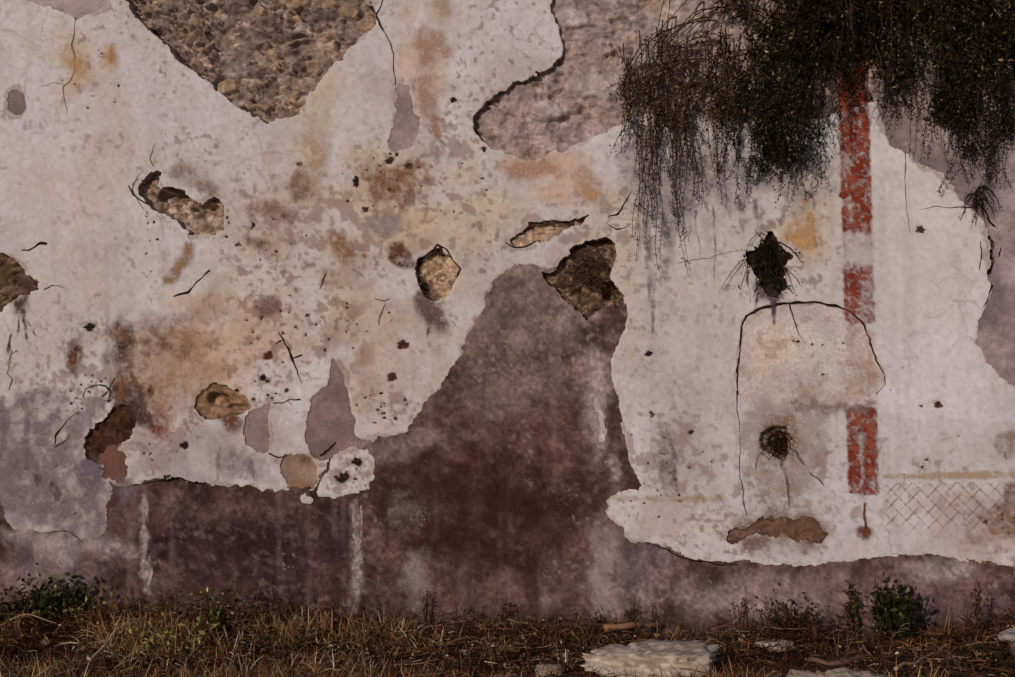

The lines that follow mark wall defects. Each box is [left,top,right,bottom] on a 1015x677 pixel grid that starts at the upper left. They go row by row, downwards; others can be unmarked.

spalling [128,0,377,124]
spalling [141,172,241,247]
spalling [474,0,1015,385]
water stain [0,322,153,551]
water stain [120,480,153,594]
water stain [351,503,363,597]
flaking render [0,232,1015,641]
crack [736,301,886,515]